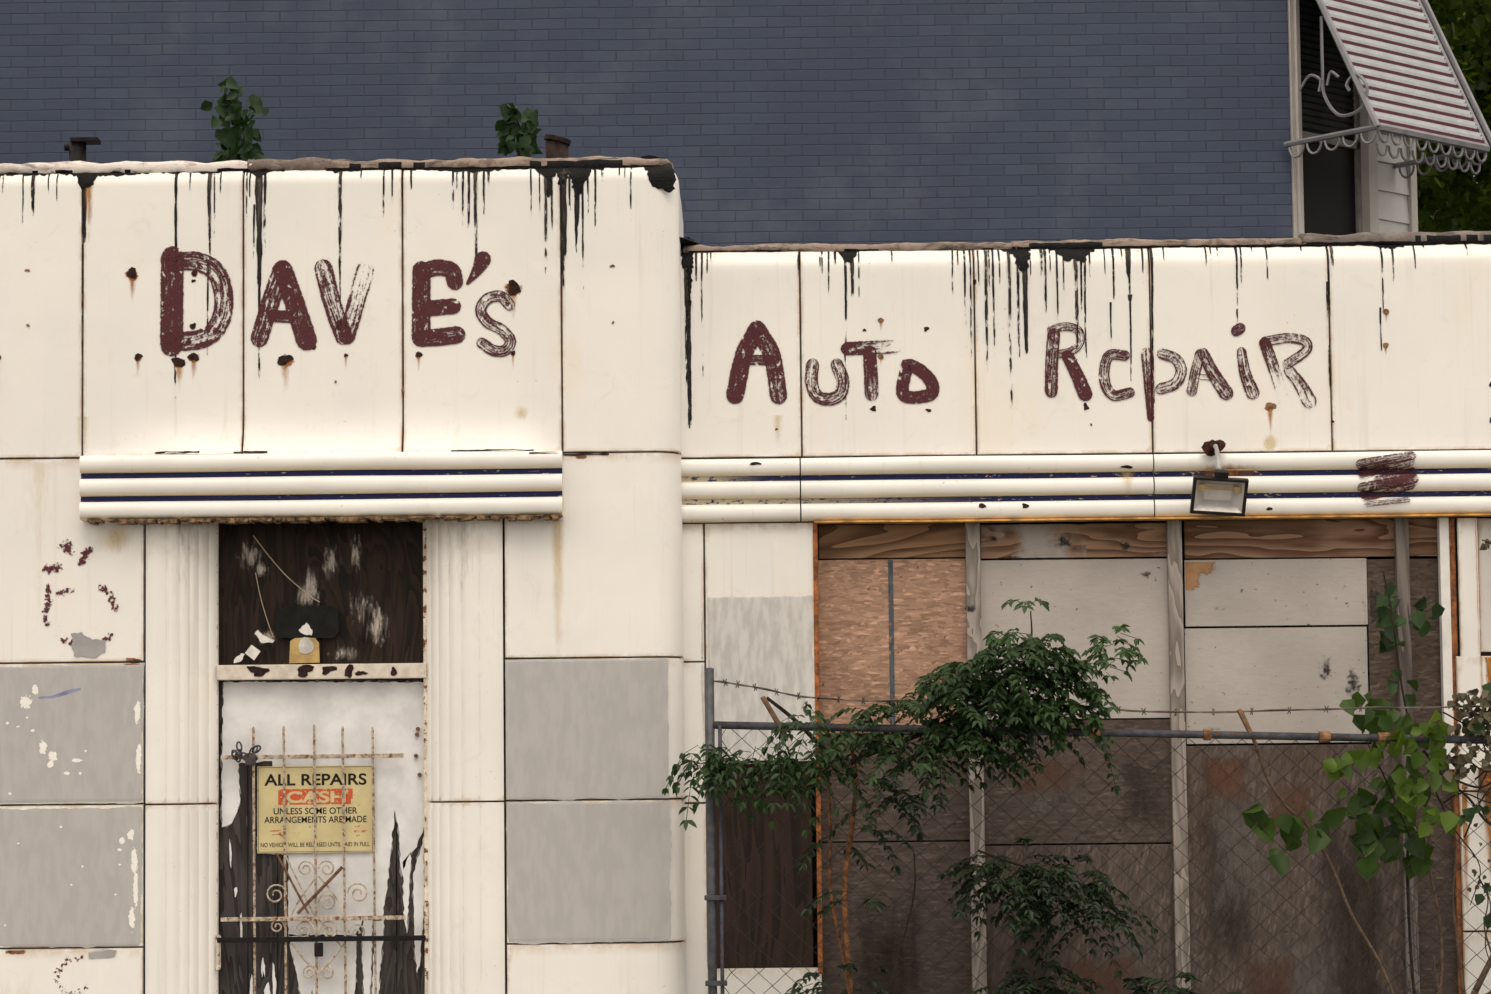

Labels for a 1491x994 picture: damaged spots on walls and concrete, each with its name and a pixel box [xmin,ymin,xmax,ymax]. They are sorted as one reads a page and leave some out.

corrosion [125,267,138,287]
corrosion [171,323,199,375]
water stain [174,172,222,355]
water stain [246,172,267,377]
corrosion [277,355,294,370]
water stain [530,168,632,286]
water stain [684,252,712,428]
water stain [951,247,1164,403]
peeling [42,546,94,574]
peeling [98,583,119,611]
corrosion [1480,640,1491,683]
peeling [220,664,424,994]